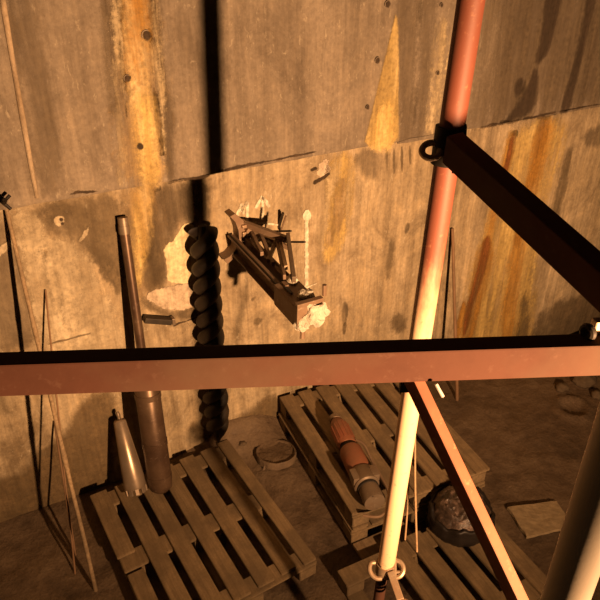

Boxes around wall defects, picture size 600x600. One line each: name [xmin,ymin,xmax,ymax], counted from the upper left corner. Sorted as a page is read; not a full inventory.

corrosion [113,0,167,231]
spalling [311,159,331,185]
corrosion [365,16,399,151]
leakage [491,0,560,130]
corrosion [503,118,563,198]
leakage [546,0,600,114]
leakage [30,181,206,304]
peeling [144,223,198,318]
corrosion [457,209,536,338]